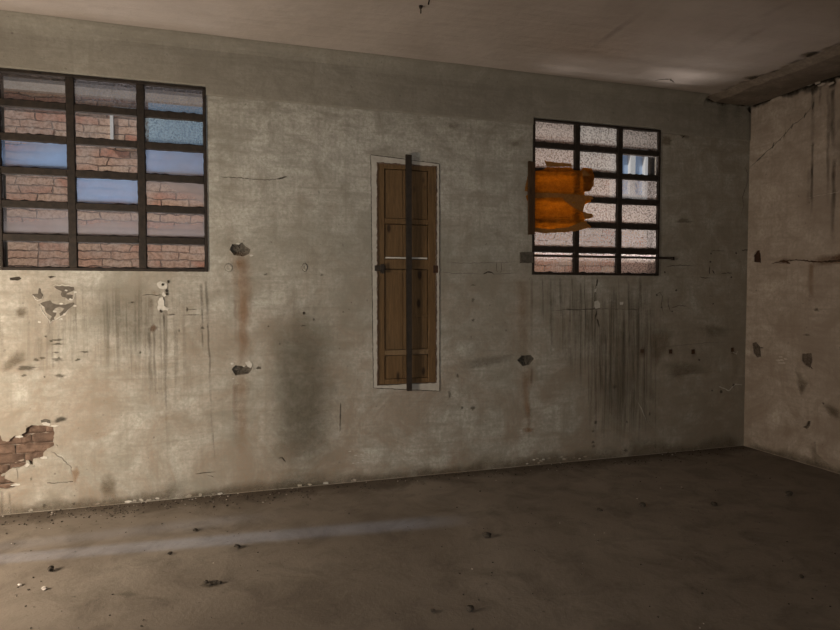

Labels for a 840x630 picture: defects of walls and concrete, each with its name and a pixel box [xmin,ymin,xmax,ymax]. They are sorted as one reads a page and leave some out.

flaking render [229,240,253,256]
peeling [31,276,77,323]
flaking render [517,354,538,366]
flaking render [231,361,261,379]
flaking render [0,418,72,491]